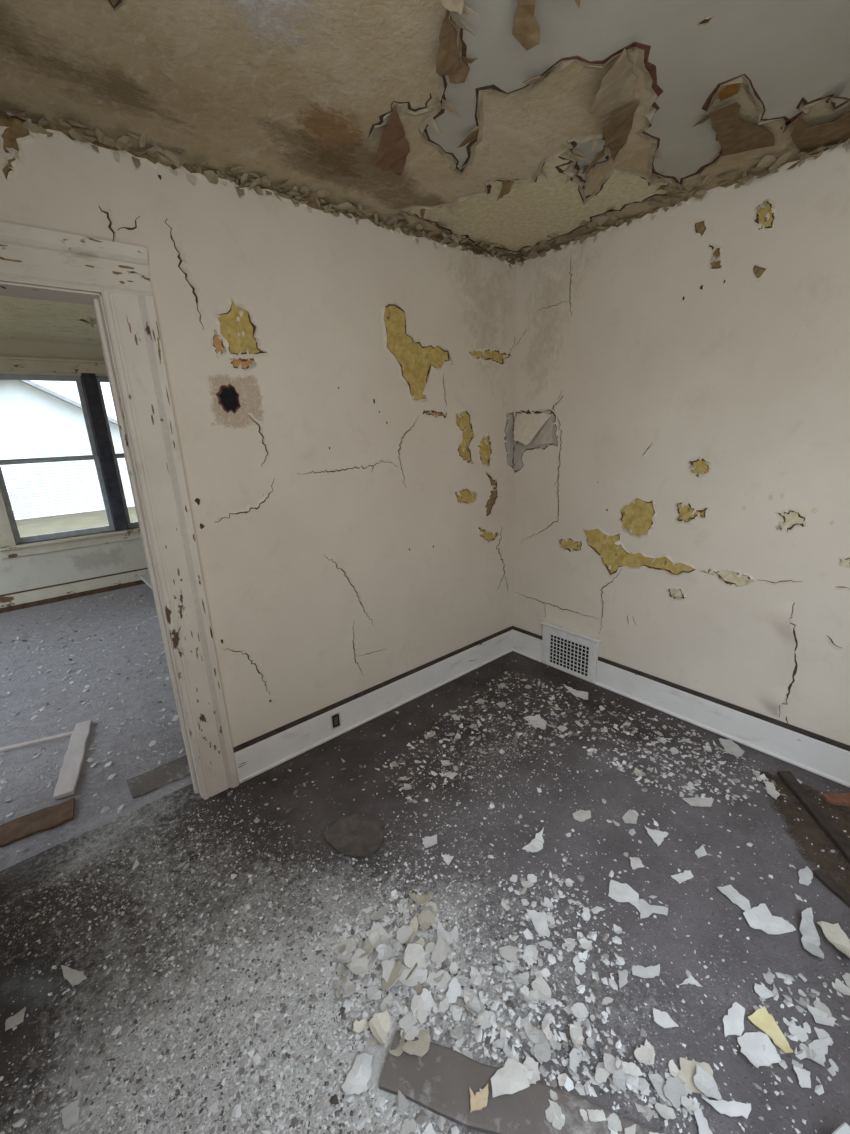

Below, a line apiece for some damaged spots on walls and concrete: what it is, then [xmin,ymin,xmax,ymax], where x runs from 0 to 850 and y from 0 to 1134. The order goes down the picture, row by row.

peeling [0,0,850,269]
peeling [209,293,270,372]
spalling [216,384,241,414]
crack [214,412,421,522]
peeling [380,300,559,544]
peeling [557,496,757,601]
crack [323,552,382,675]
crack [222,646,273,694]